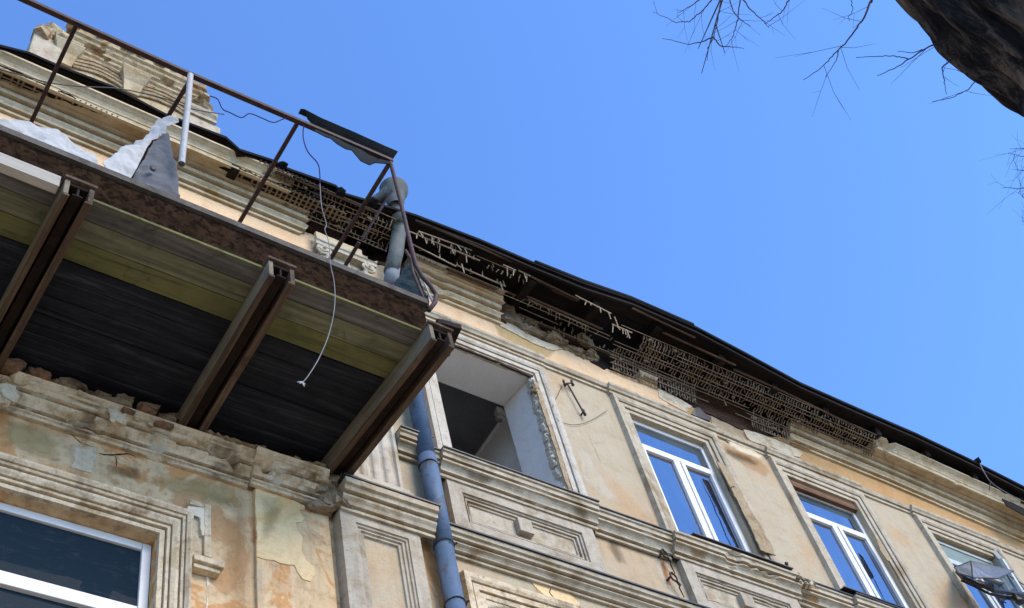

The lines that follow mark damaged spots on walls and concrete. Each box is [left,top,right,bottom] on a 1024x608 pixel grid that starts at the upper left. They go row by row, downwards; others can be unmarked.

spalling [500,304,612,370]
spalling [0,358,181,431]
crack [73,435,136,468]
spalling [454,344,572,490]
flaking render [657,383,803,458]
peeling [255,456,354,582]